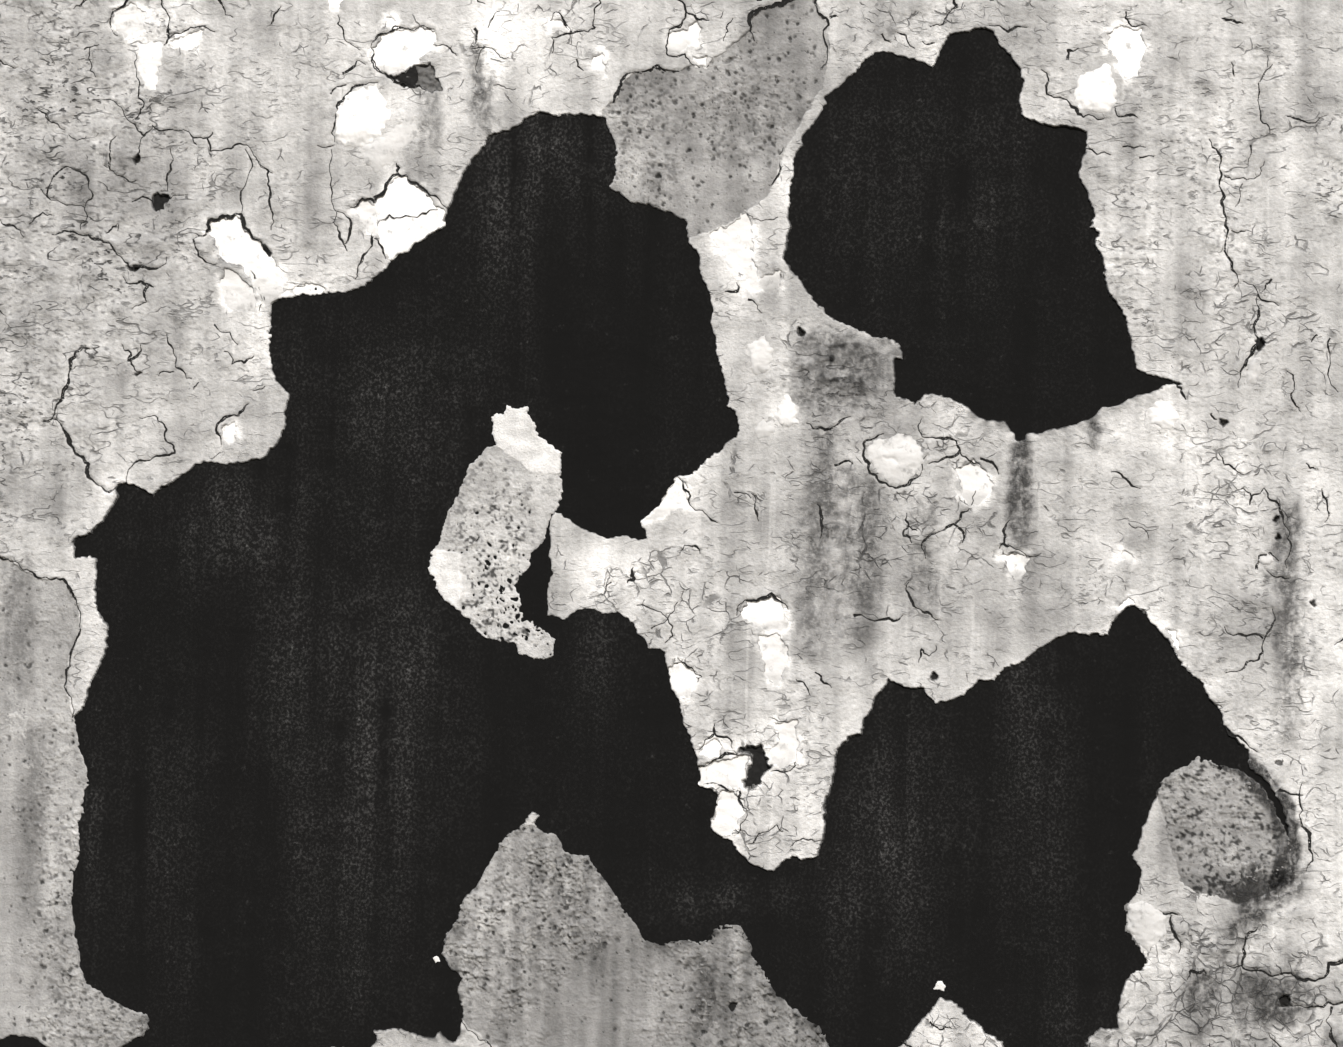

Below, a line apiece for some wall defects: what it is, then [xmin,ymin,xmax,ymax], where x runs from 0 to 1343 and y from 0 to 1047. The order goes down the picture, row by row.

crack [0,0,274,311]
peeling [208,216,286,306]
peeling [355,176,446,260]
crack [317,0,516,280]
peeling [602,0,830,294]
spalling [784,26,1180,441]
crack [1209,56,1327,388]
crack [43,348,176,493]
crack [807,416,999,662]
peeling [442,824,829,1047]
peeling [1156,756,1291,904]
crack [1162,912,1343,1047]